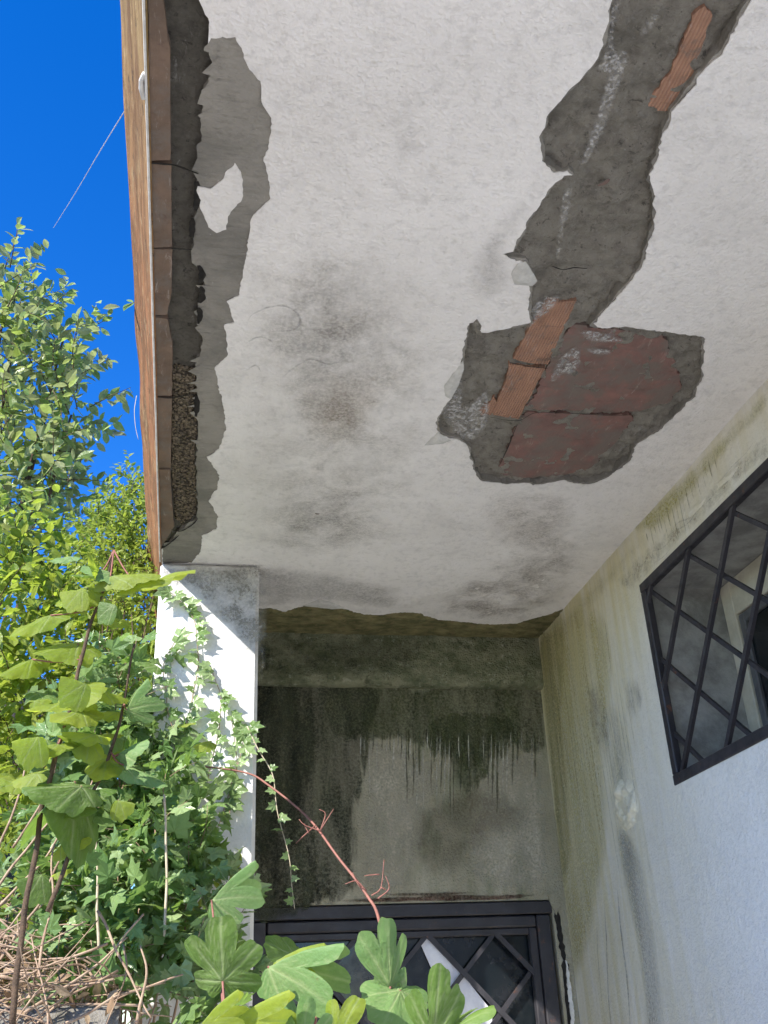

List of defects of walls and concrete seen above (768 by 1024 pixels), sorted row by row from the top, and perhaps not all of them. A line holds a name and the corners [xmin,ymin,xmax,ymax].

flaking render [147,0,272,564]
flaking render [425,0,743,480]
damp [254,686,469,923]
damp [473,732,543,885]